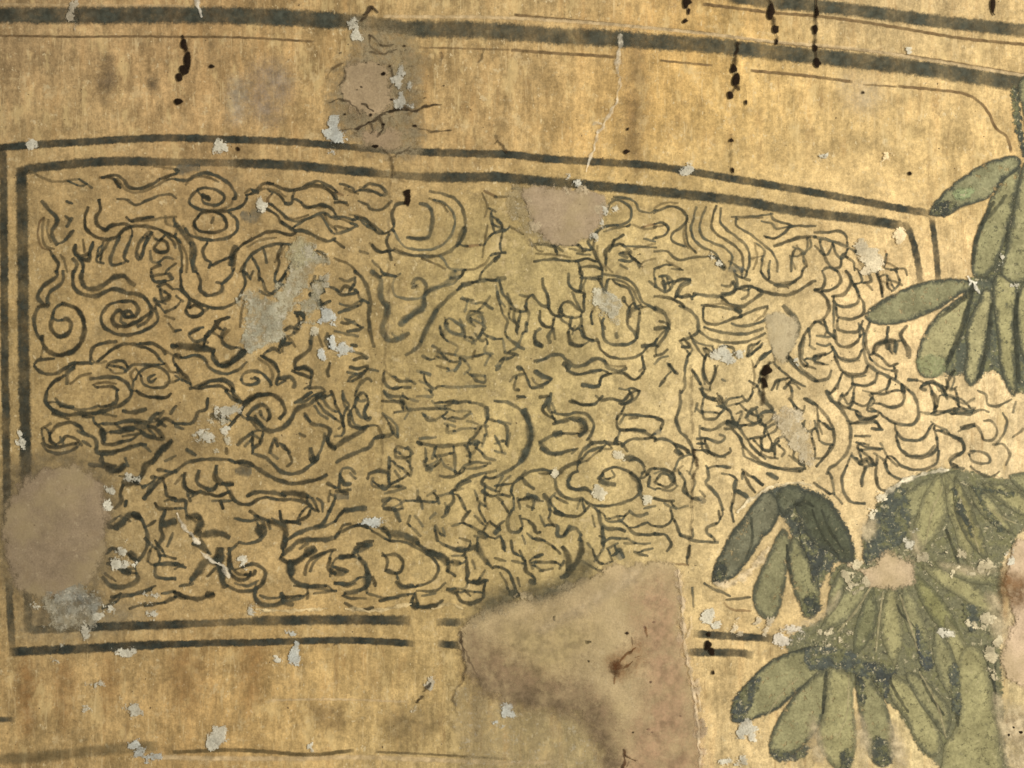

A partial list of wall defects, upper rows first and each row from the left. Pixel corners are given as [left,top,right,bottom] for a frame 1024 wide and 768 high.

flaking render [322,17,426,157]
peeling [553,173,590,195]
peeling [285,236,328,270]
peeling [590,202,619,241]
peeling [300,272,353,361]
flaking render [840,528,932,595]
peeling [81,604,114,641]
flaking render [458,561,708,768]